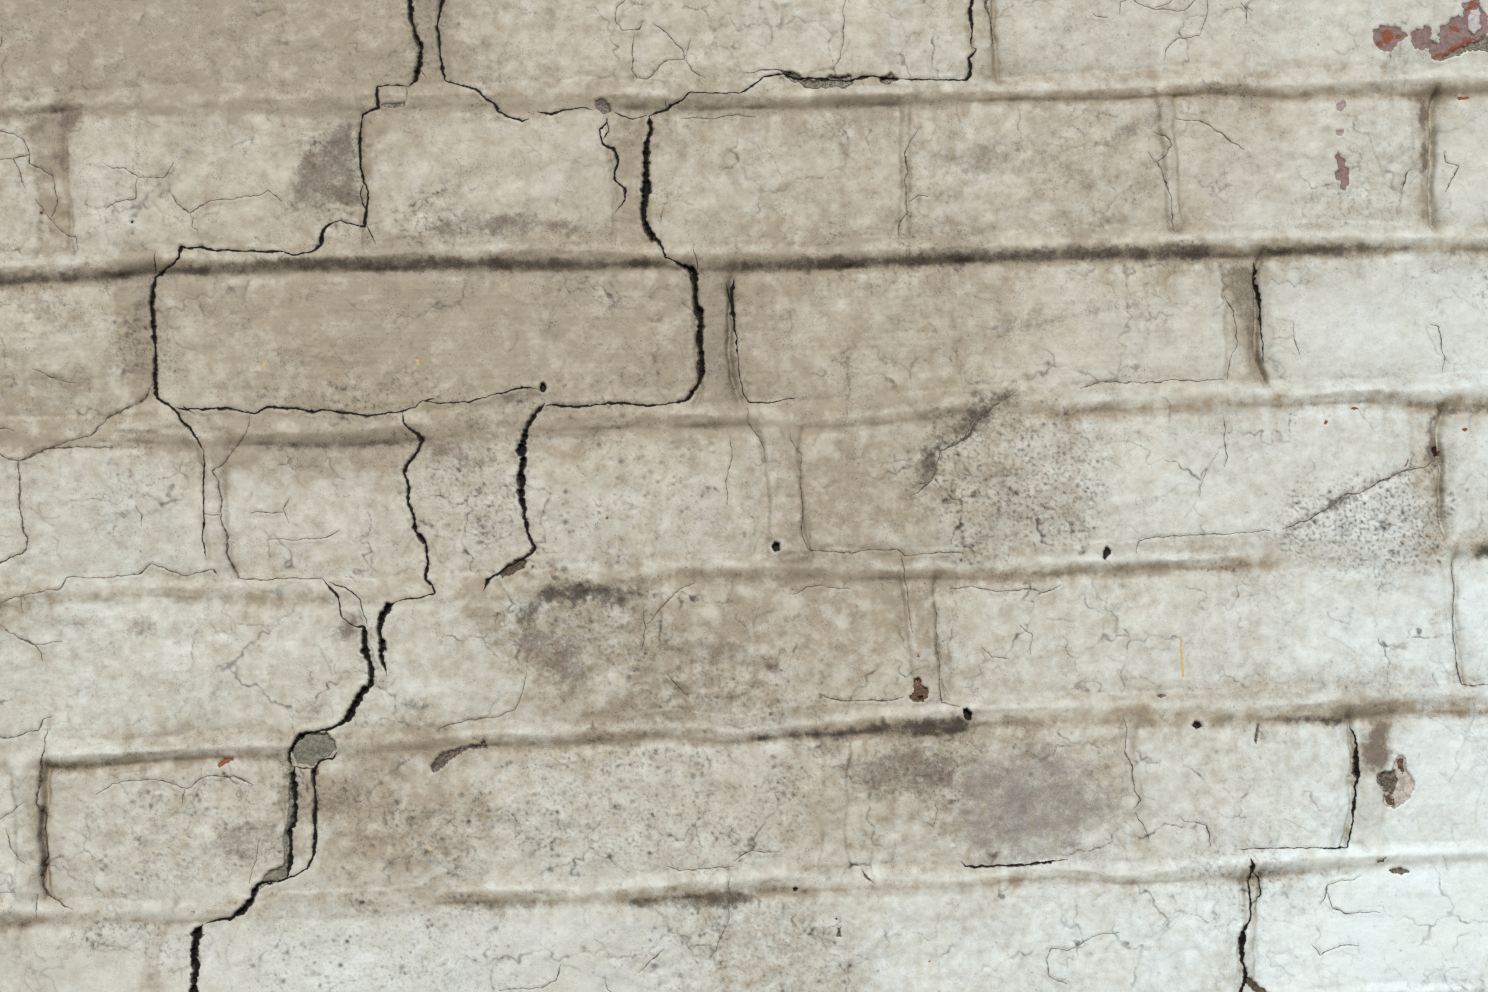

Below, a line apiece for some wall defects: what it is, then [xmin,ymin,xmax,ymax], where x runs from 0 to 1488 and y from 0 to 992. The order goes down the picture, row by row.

peeling [1372,0,1488,61]
crack [0,0,1067,992]
crack [1123,716,1149,838]
spalling [1377,755,1415,809]
crack [1181,725,1381,992]
crack [1046,932,1119,984]